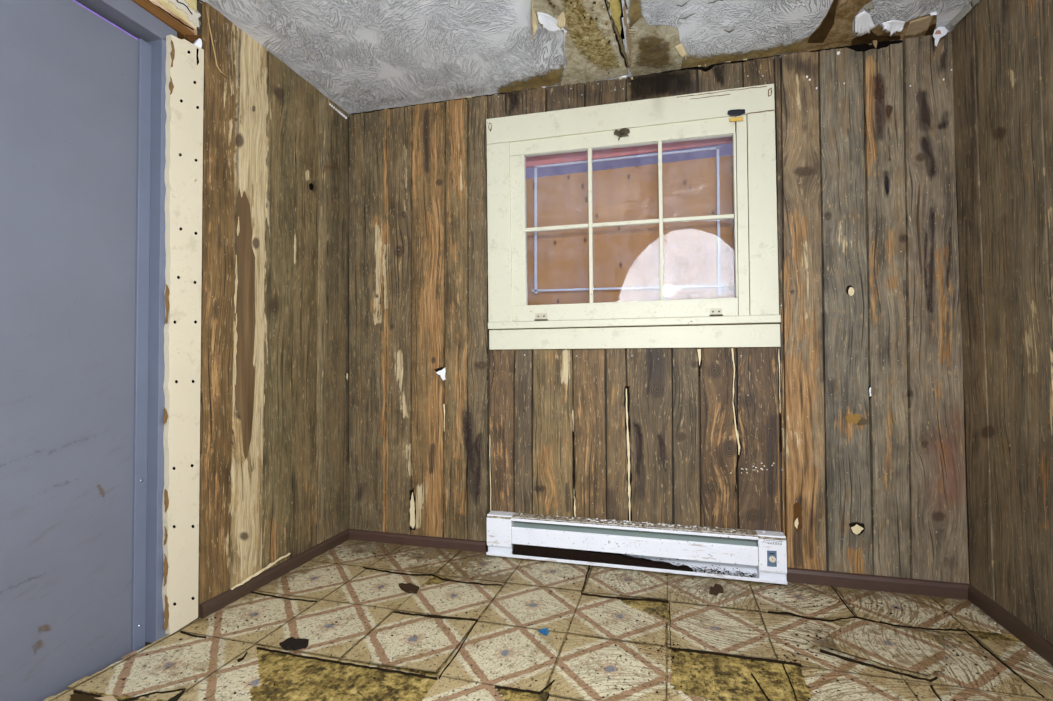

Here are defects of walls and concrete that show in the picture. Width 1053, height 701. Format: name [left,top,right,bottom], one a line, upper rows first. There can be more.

peeling [168,0,202,48]
spalling [560,0,633,80]
water stain [498,0,801,108]
peeling [798,0,938,52]
peeling [950,0,980,27]
peeling [968,605,1038,665]
peeling [249,646,436,701]
peeling [665,645,813,701]